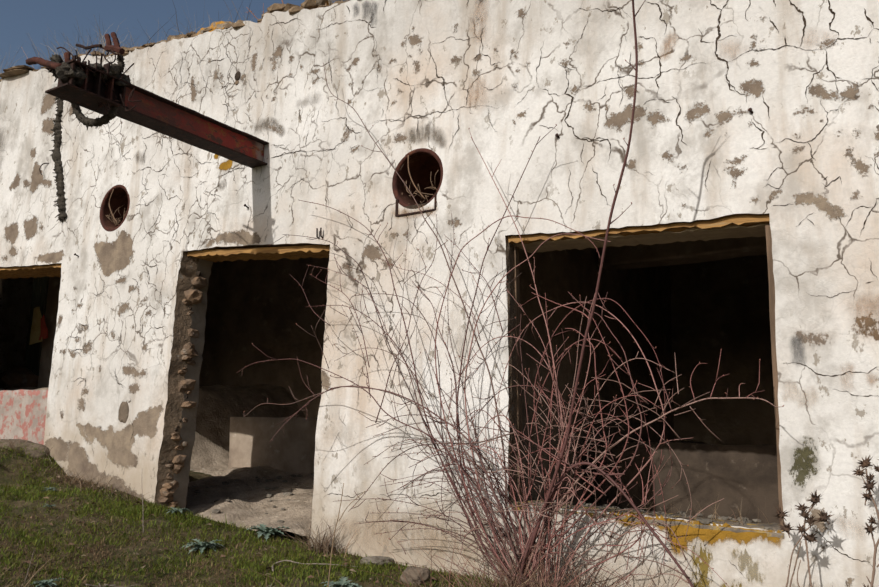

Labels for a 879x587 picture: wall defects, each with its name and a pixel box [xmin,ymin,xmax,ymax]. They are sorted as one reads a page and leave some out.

crack [179,18,297,122]
crack [271,0,879,205]
peeling [0,215,64,268]
crack [65,117,246,354]
flaking render [44,228,331,508]
crack [786,362,876,397]
damp [790,436,818,488]